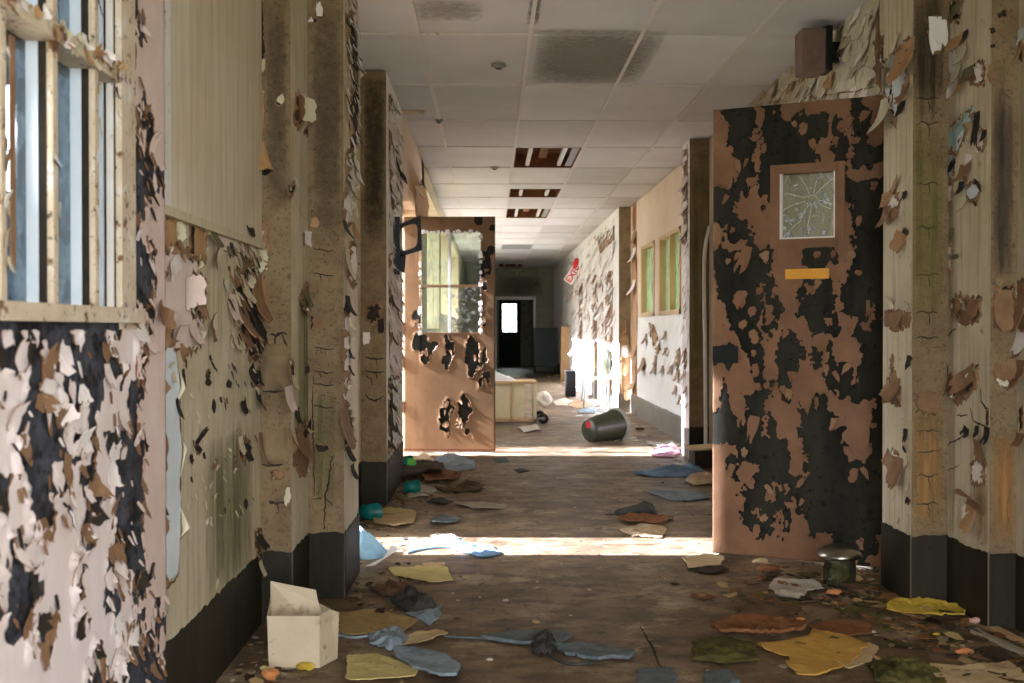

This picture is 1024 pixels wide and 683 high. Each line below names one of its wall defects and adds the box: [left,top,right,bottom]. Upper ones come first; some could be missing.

water stain [540,34,651,80]
peeling [0,0,508,683]
crack [312,347,334,530]
peeling [533,149,689,442]
peeling [706,0,1024,677]